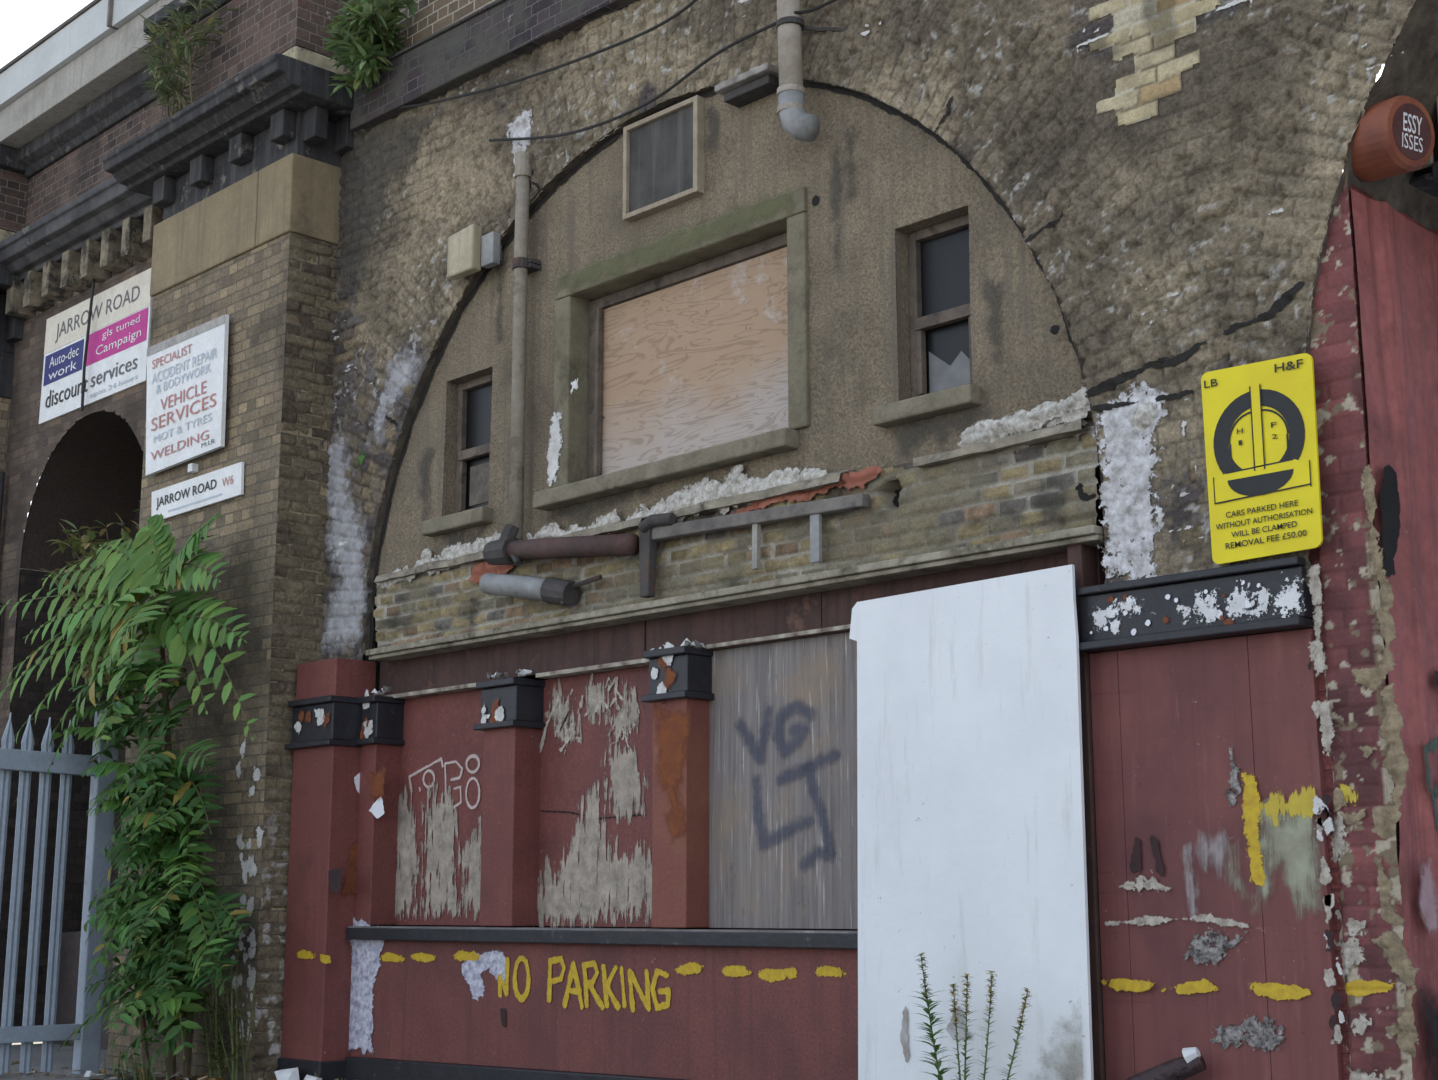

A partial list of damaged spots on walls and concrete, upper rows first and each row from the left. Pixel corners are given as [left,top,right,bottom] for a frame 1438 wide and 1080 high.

leakage [370,355,418,438]
leakage [323,434,366,648]
leakage [445,533,474,546]
flaking render [527,464,882,540]
peeling [913,380,1328,677]
peeling [650,638,705,703]
peeling [395,777,482,922]
peeling [534,678,652,928]
rust [654,710,690,837]
peeling [1117,835,1171,892]
spalling [1311,464,1421,1080]
peeling [1184,930,1248,966]